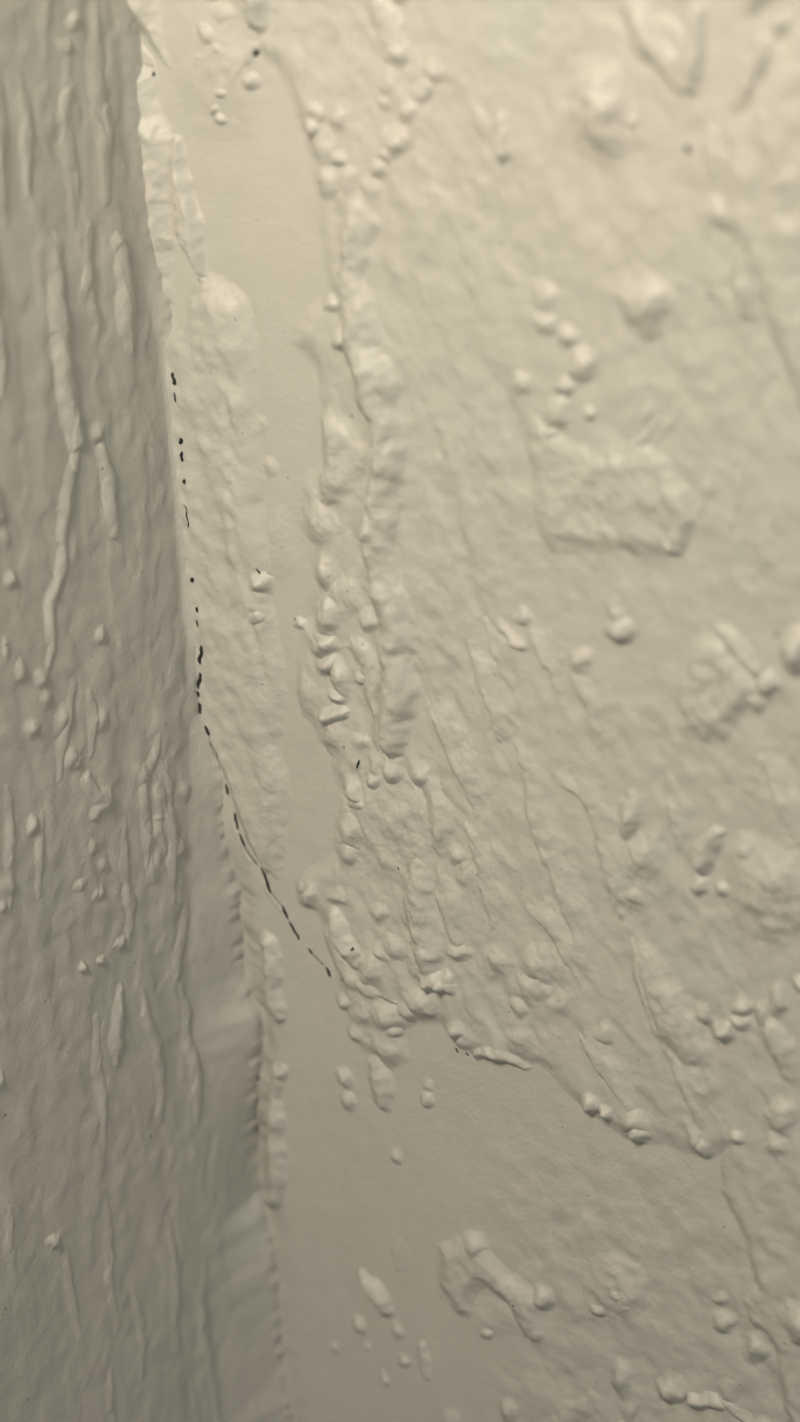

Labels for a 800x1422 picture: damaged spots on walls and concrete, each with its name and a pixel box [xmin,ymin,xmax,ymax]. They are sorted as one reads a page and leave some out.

crack [179,438,189,527]
crack [190,577,343,981]